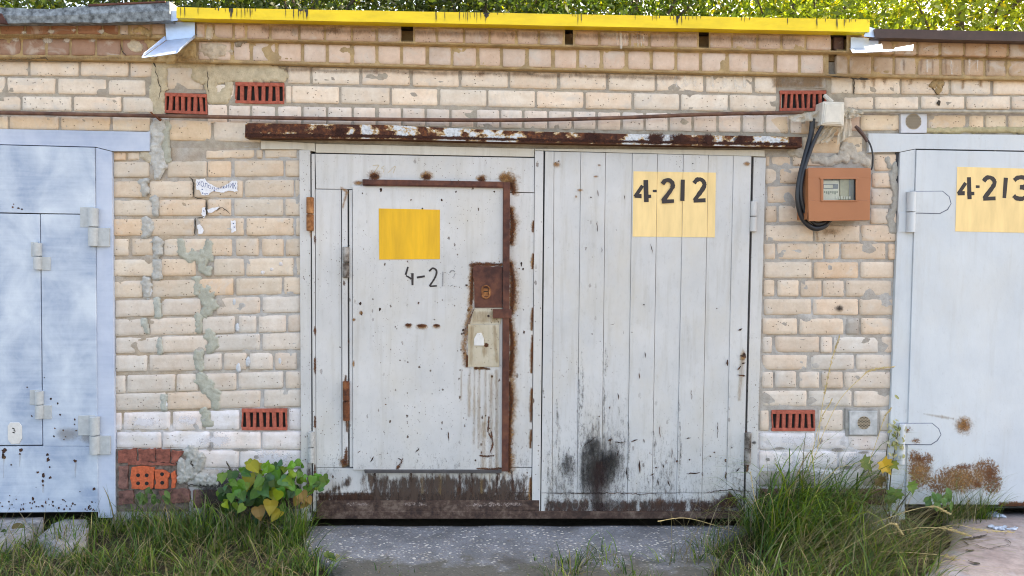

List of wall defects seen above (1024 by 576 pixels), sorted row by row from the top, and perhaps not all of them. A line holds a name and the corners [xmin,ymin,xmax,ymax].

corrosion [246,128,797,146]
corrosion [493,173,517,245]
corrosion [307,254,534,513]
peeling [200,436,295,464]
water stain [547,370,699,508]
corrosion [958,418,972,434]
corrosion [906,427,1024,506]